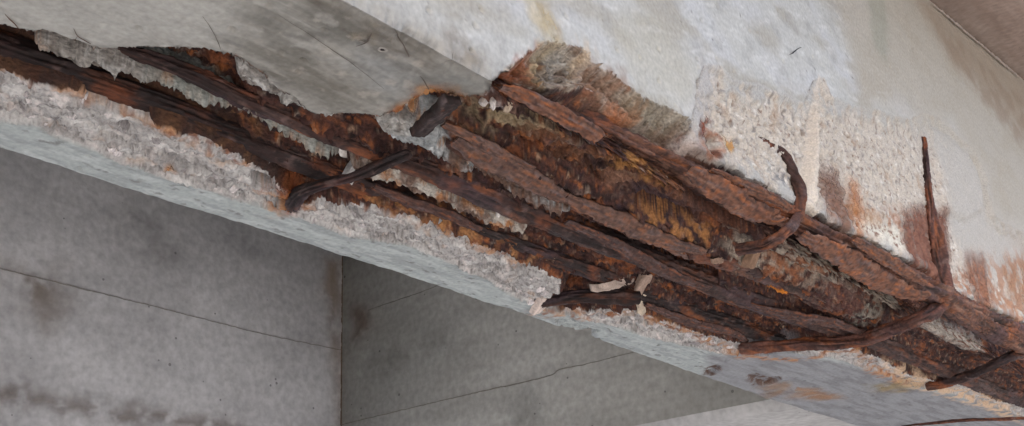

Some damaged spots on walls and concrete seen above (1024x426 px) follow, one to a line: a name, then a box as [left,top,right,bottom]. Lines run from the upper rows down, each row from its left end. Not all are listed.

rust [498,84,605,144]
spalling [0,24,1024,356]
rust [440,121,713,291]
rust [683,120,793,225]
rust [821,175,857,226]
rust [795,210,949,306]
rust [644,302,749,343]
rust [744,302,865,335]
rust [948,260,1014,335]
spalling [704,365,723,376]
spalling [748,373,783,386]
spalling [754,314,1024,416]